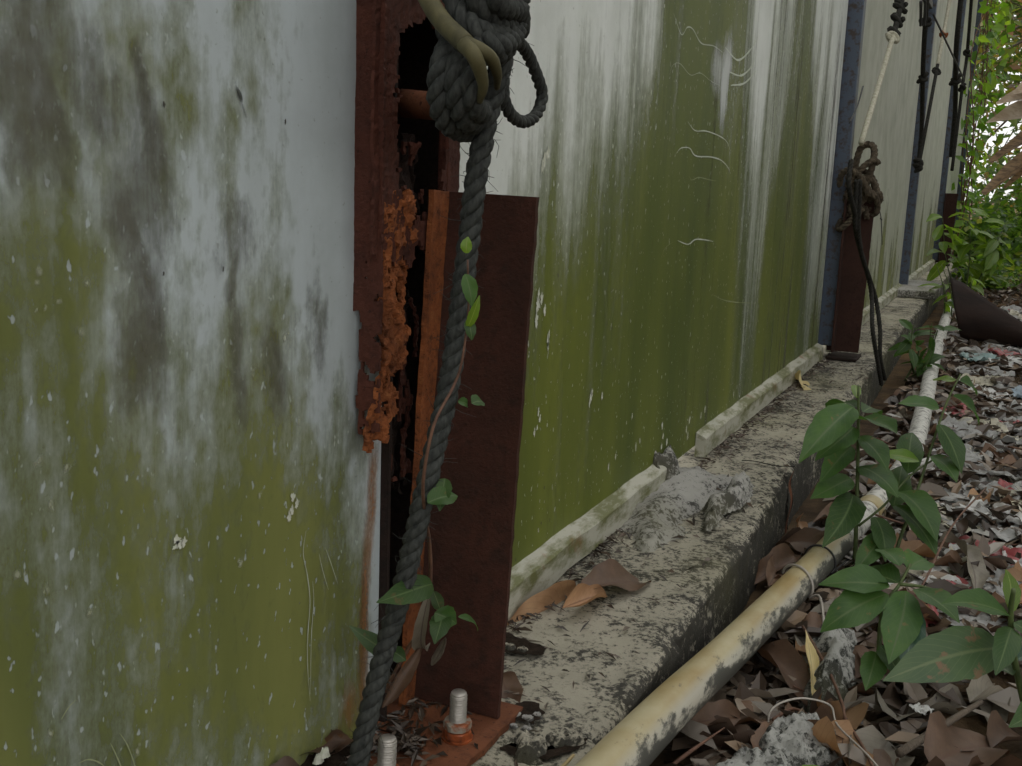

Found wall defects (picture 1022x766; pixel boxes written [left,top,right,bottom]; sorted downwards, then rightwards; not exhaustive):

rust [438,137,460,192]
damp [112,184,165,382]
rust [360,0,435,630]
peeling [172,534,187,550]